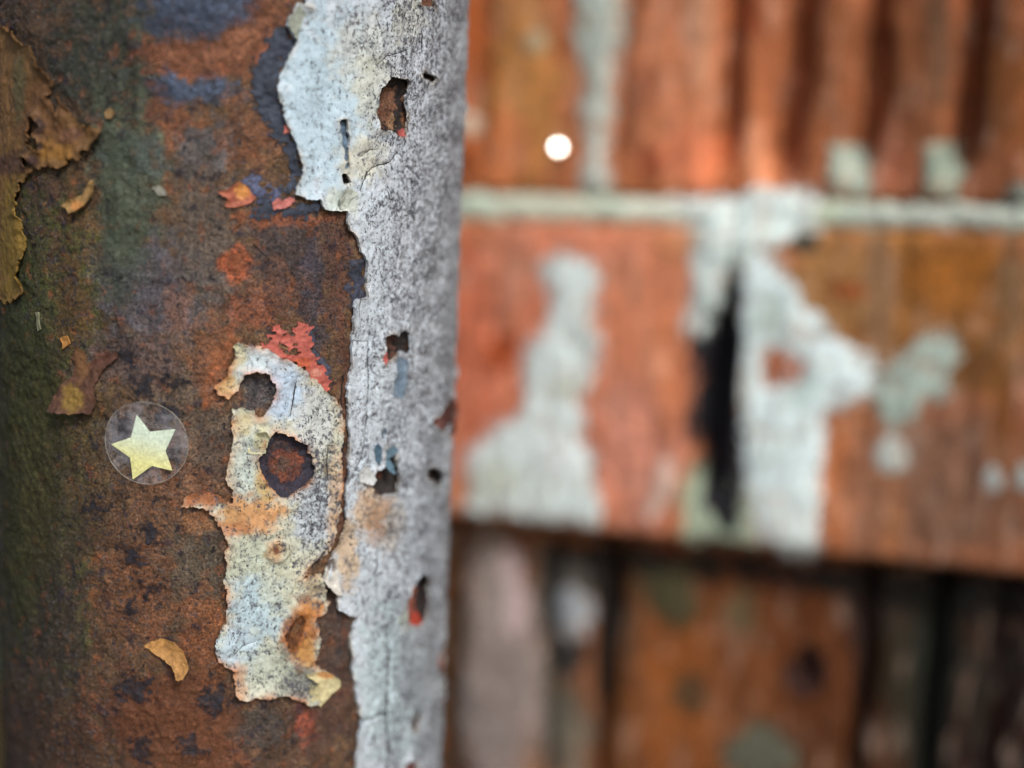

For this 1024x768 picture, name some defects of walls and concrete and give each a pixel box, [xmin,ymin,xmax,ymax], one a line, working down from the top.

peeling [0,24,115,305]
corrosion [150,1,283,75]
peeling [180,0,470,768]